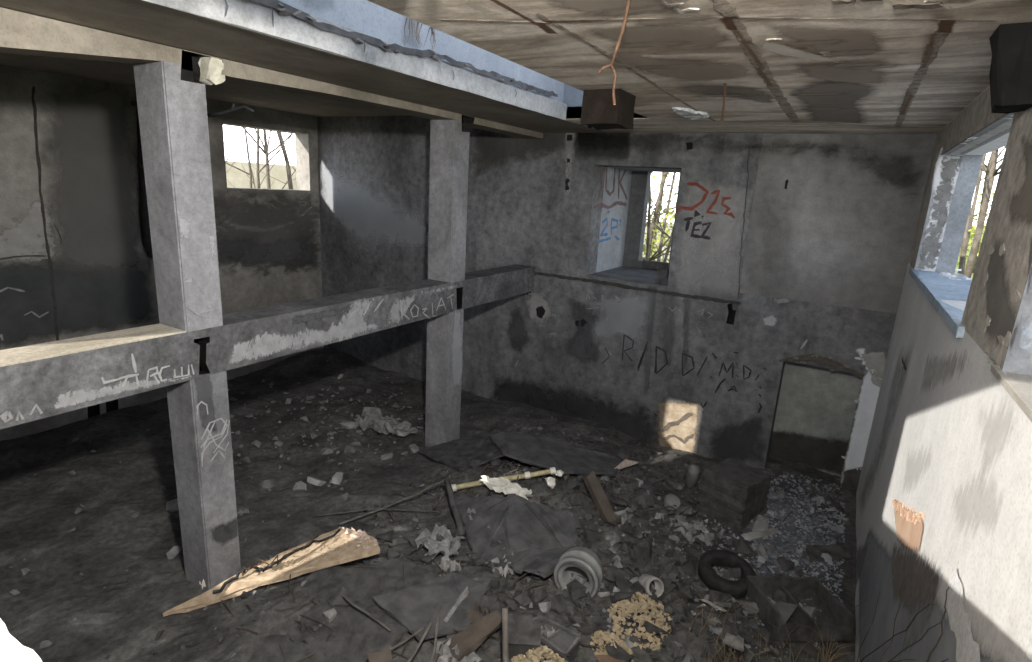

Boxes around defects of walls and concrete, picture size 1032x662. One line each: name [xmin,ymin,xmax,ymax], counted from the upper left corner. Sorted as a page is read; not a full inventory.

leakage [554,0,773,103]
peeling [672,107,709,120]
peeling [762,38,842,63]
leakage [774,26,898,123]
corrosion [922,20,955,68]
peeling [909,115,1032,348]
peeling [229,285,457,364]